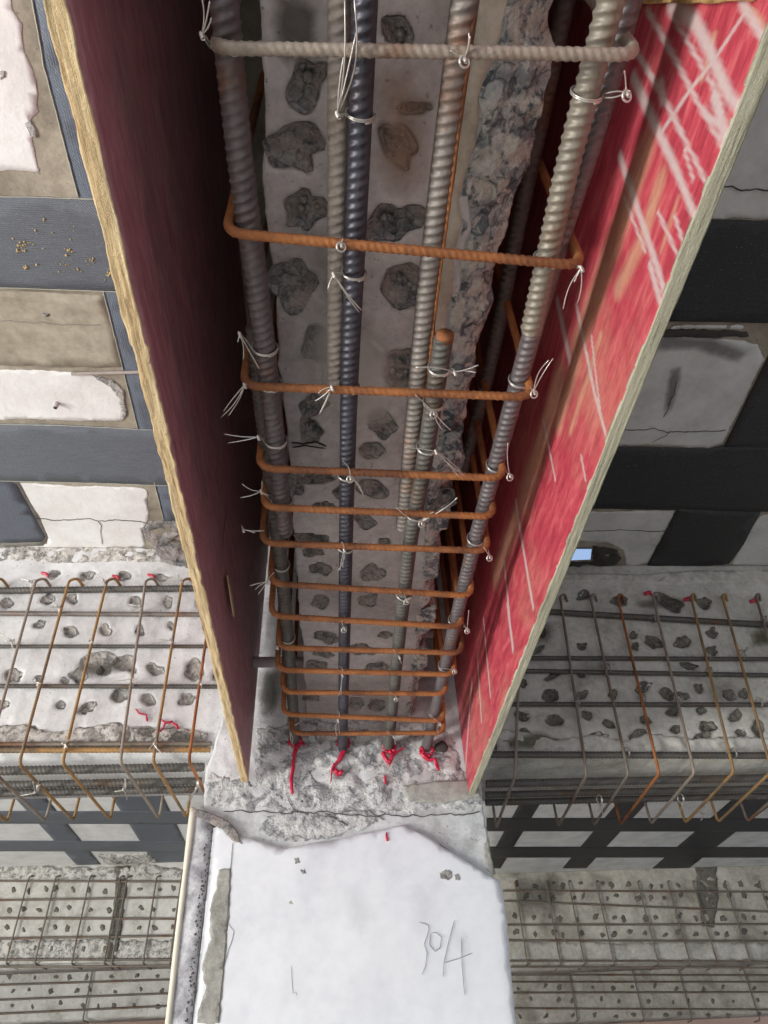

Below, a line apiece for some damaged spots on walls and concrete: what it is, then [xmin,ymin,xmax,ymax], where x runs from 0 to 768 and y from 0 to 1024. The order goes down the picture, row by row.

spalling [498,0,556,47]
crack [625,382,725,443]
spalling [192,59,552,844]
crack [35,518,148,544]
crack [185,799,480,1023]